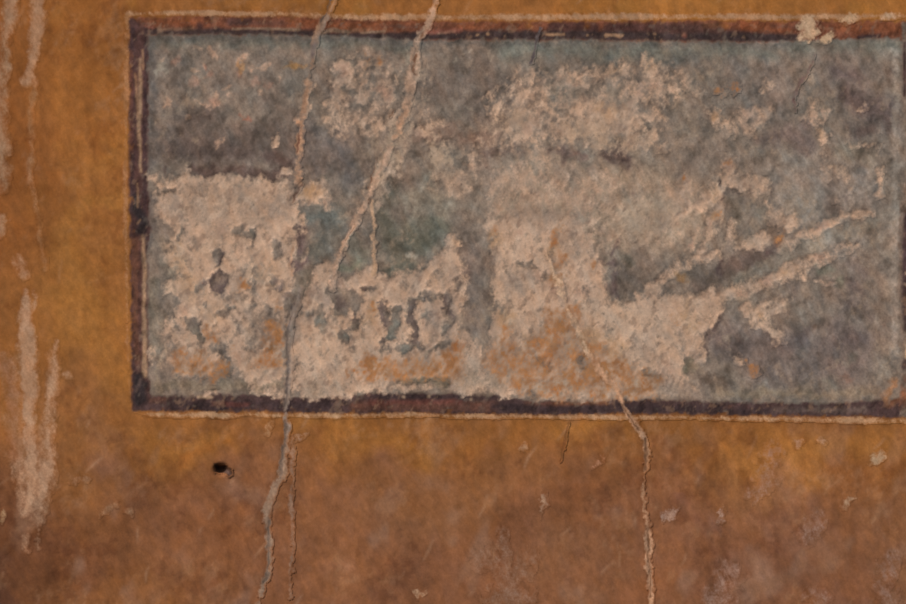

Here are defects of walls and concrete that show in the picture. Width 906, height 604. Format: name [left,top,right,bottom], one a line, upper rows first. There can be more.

damp [0,0,74,555]
crack [254,243,305,604]
crack [289,0,337,205]
crack [327,0,440,293]
peeling [143,45,888,406]
crack [544,250,656,604]
peeling [794,11,860,45]